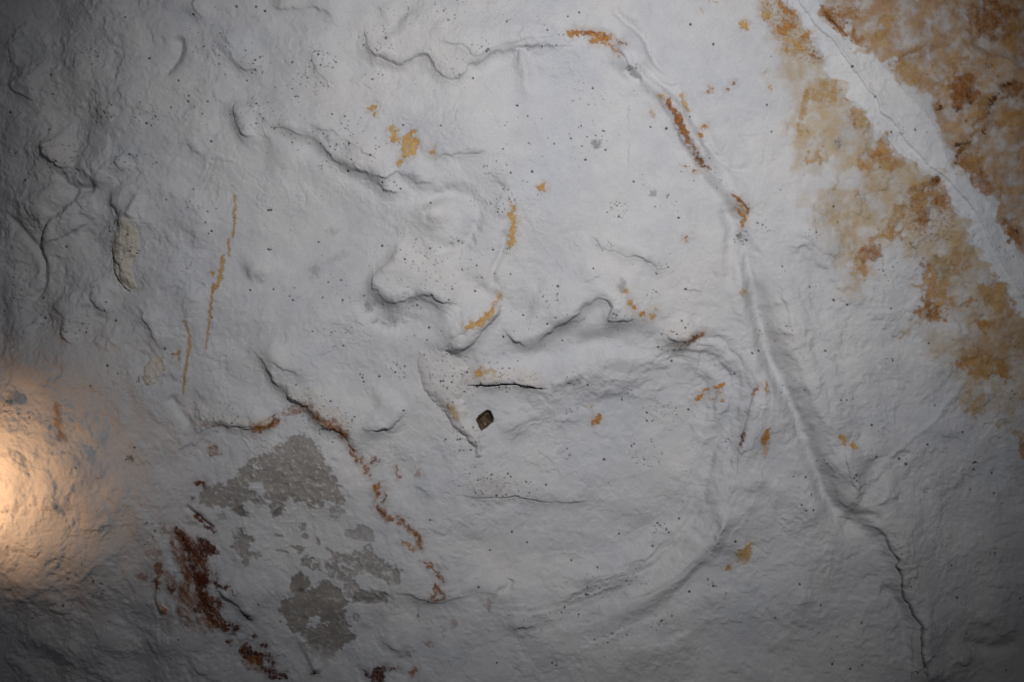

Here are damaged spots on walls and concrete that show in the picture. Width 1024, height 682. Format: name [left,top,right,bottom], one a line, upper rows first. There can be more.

corrosion [567,30,624,57]
corrosion [659,94,712,172]
corrosion [732,195,749,227]
corrosion [252,415,280,433]
corrosion [313,412,422,551]
corrosion [153,514,288,680]
peeling [278,547,355,647]
corrosion [424,562,445,602]